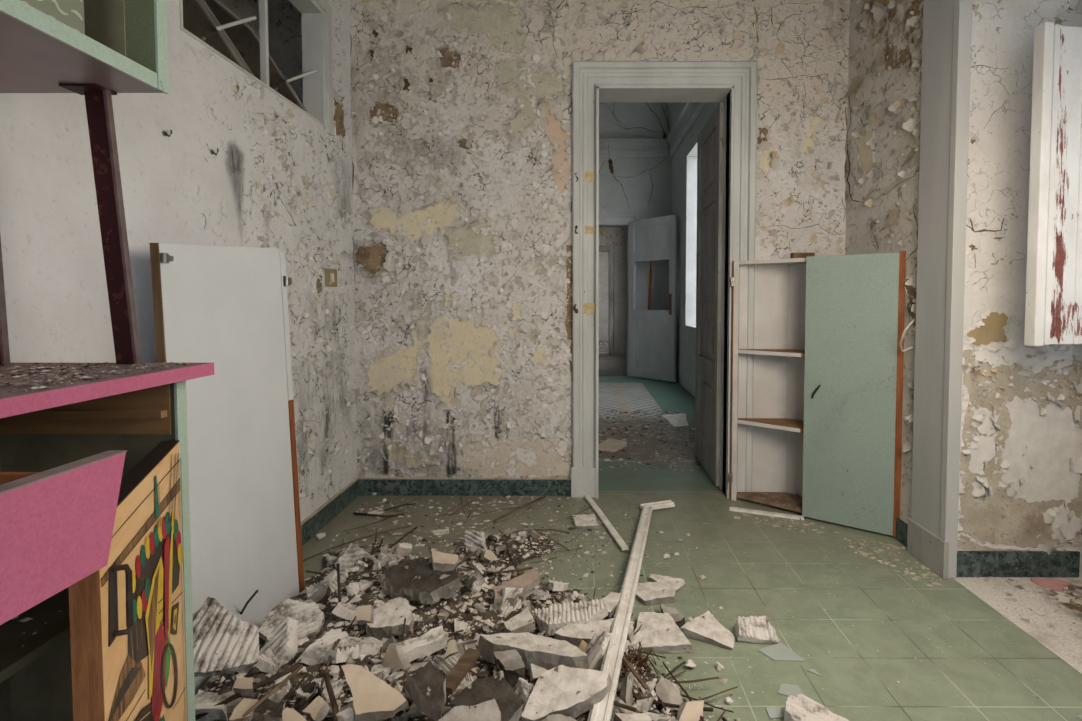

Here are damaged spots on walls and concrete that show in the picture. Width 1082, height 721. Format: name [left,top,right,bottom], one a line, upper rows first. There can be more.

damp [383,412,391,474]
flaking render [253,10,573,500]
crack [599,102,670,211]
peeling [755,0,923,340]
peeling [901,379,914,452]
peeling [957,66,1082,555]